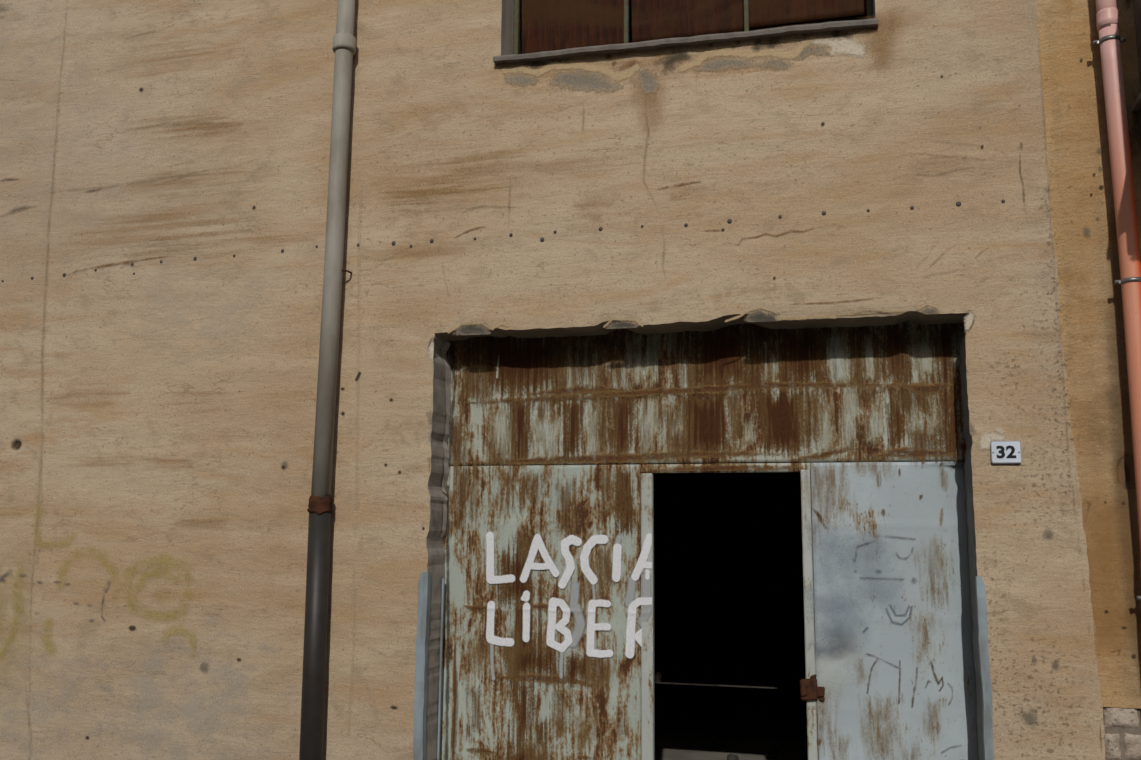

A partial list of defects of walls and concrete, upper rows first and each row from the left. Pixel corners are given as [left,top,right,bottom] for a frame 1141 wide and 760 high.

flaking render [502,55,660,94]
flaking render [678,33,865,72]
crack [748,230,807,238]
corrosion [449,323,963,536]
corrosion [451,643,493,760]
corrosion [465,529,626,760]